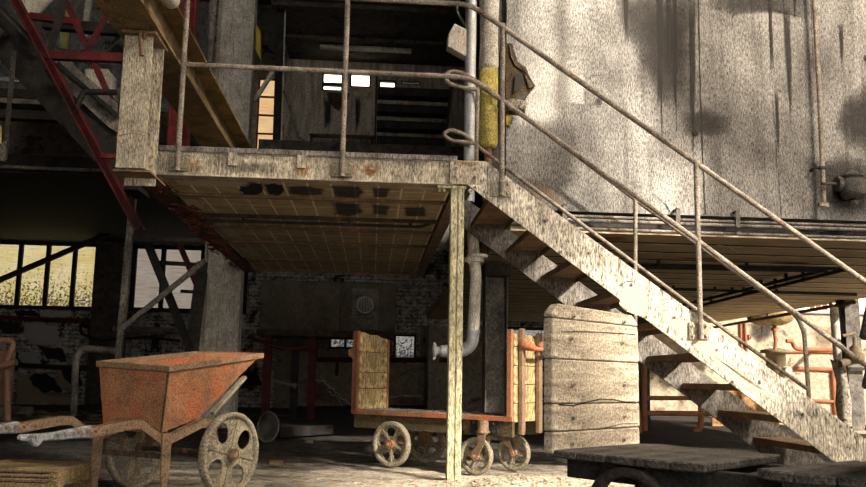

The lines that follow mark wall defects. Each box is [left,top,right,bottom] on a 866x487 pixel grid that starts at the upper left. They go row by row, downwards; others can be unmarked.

damp [784,1,796,116]
peeling [0,309,83,393]